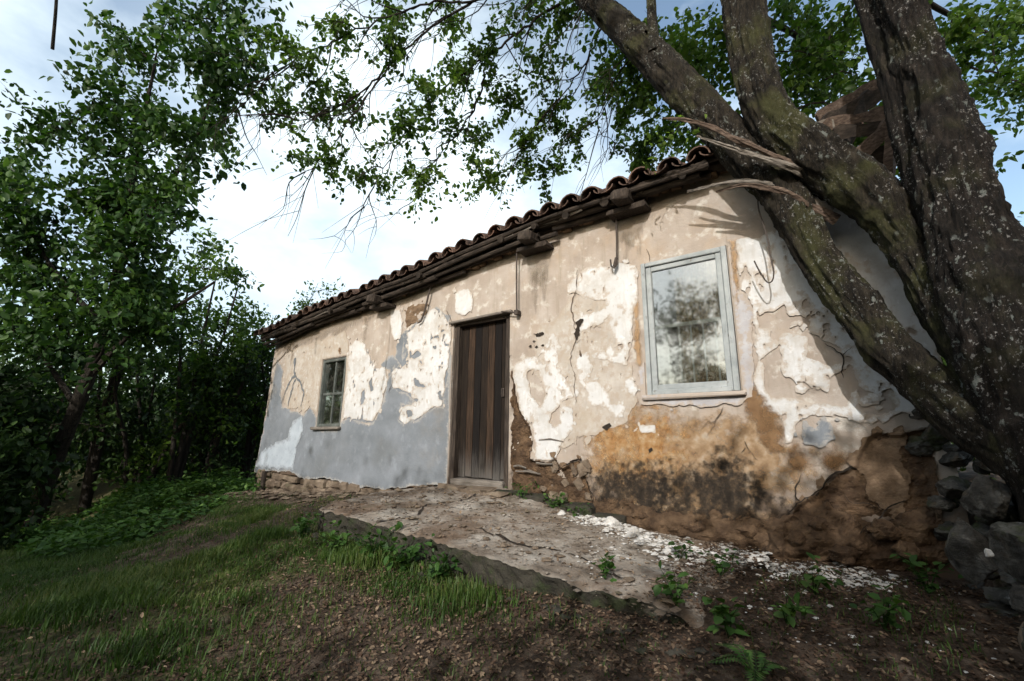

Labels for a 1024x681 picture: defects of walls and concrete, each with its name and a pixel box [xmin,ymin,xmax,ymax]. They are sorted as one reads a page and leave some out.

flaking render [254,286,474,490]
crack [570,270,584,404]
peeling [510,259,659,504]
damp [585,387,817,519]
crack [826,344,851,375]
peeling [735,208,942,534]